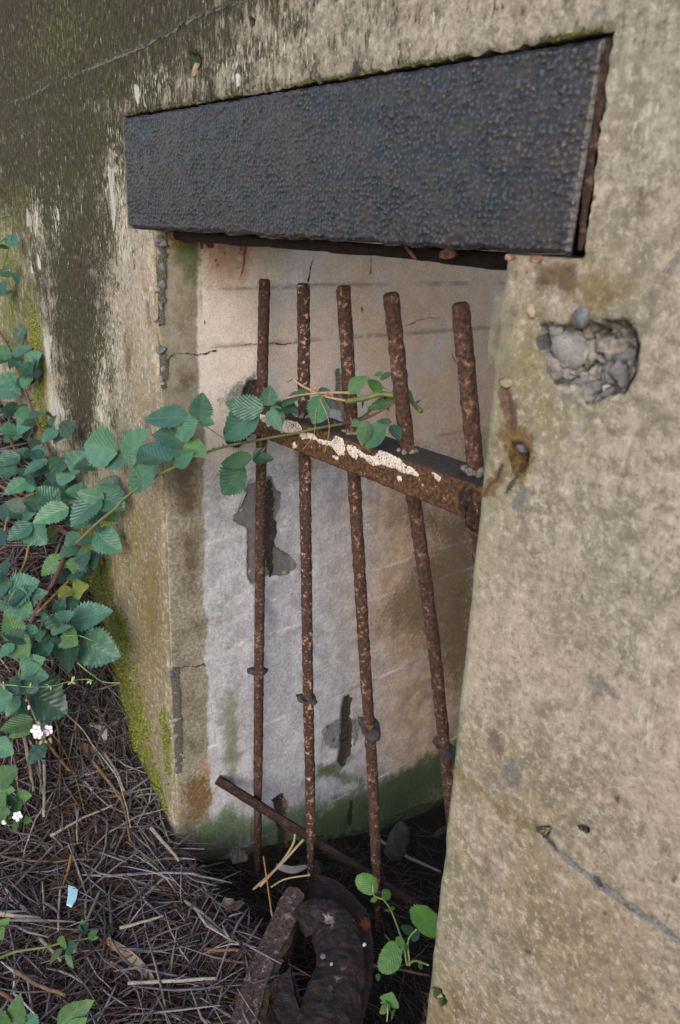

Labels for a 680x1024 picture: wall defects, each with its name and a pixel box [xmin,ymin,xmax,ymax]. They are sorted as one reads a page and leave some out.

crack [2,0,246,105]
water stain [26,210,39,236]
water stain [108,164,117,231]
water stain [43,333,65,425]
corrosion [498,378,517,433]
spalling [535,306,640,404]
spalling [233,476,297,584]
spalling [321,695,359,767]
crack [541,830,680,944]